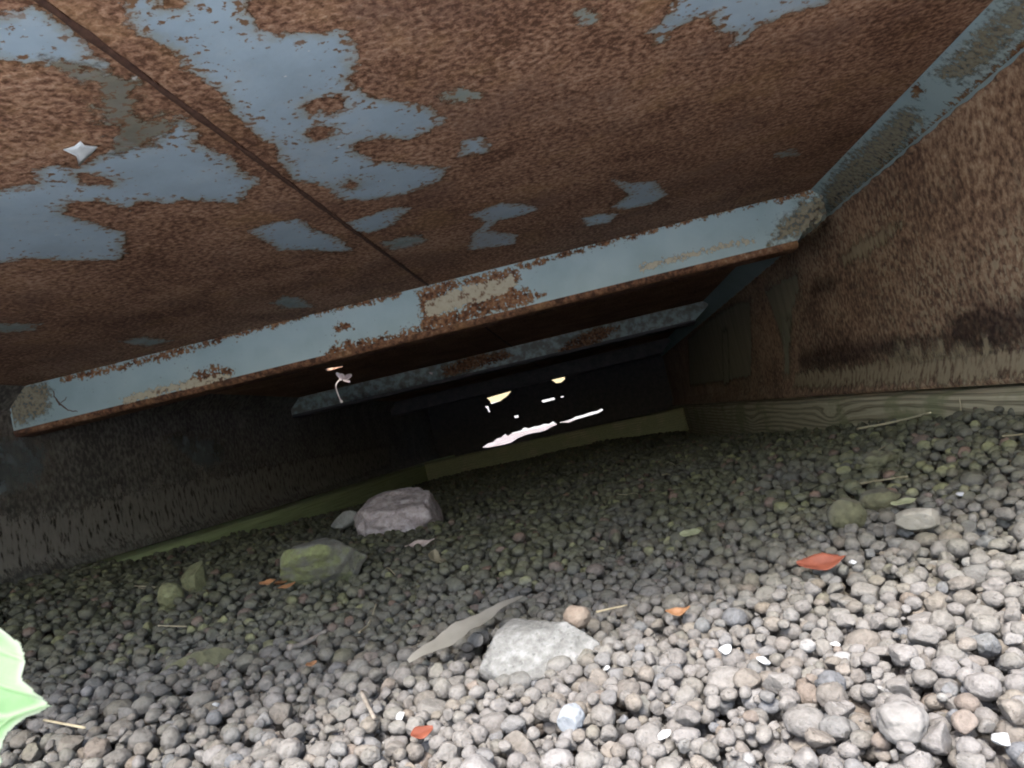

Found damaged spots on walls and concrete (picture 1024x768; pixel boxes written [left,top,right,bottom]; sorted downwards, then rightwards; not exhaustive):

peeling [644,0,830,47]
peeling [0,4,260,263]
peeling [117,0,492,253]
peeling [466,202,538,251]
rust [11,0,1024,427]
peeling [580,178,668,226]
peeling [424,274,518,317]
peeling [119,374,232,405]